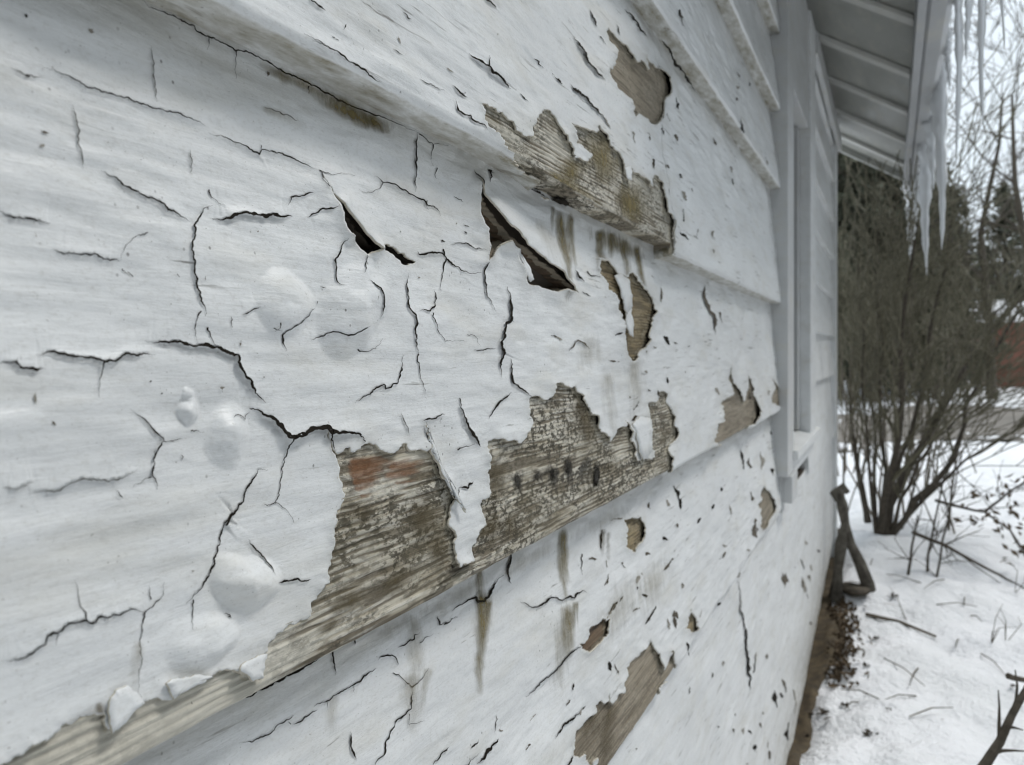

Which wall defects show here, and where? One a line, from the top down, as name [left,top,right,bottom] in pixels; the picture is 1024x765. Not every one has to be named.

crack [571,10,607,123]
peeling [607,27,679,141]
peeling [483,105,697,255]
crack [1,1,439,698]
crack [274,238,529,450]
damp [609,234,644,282]
peeling [600,261,689,362]
peeling [714,372,759,443]
peeling [2,377,677,765]
crack [246,554,585,765]
damp [563,604,578,645]
crack [738,582,756,690]